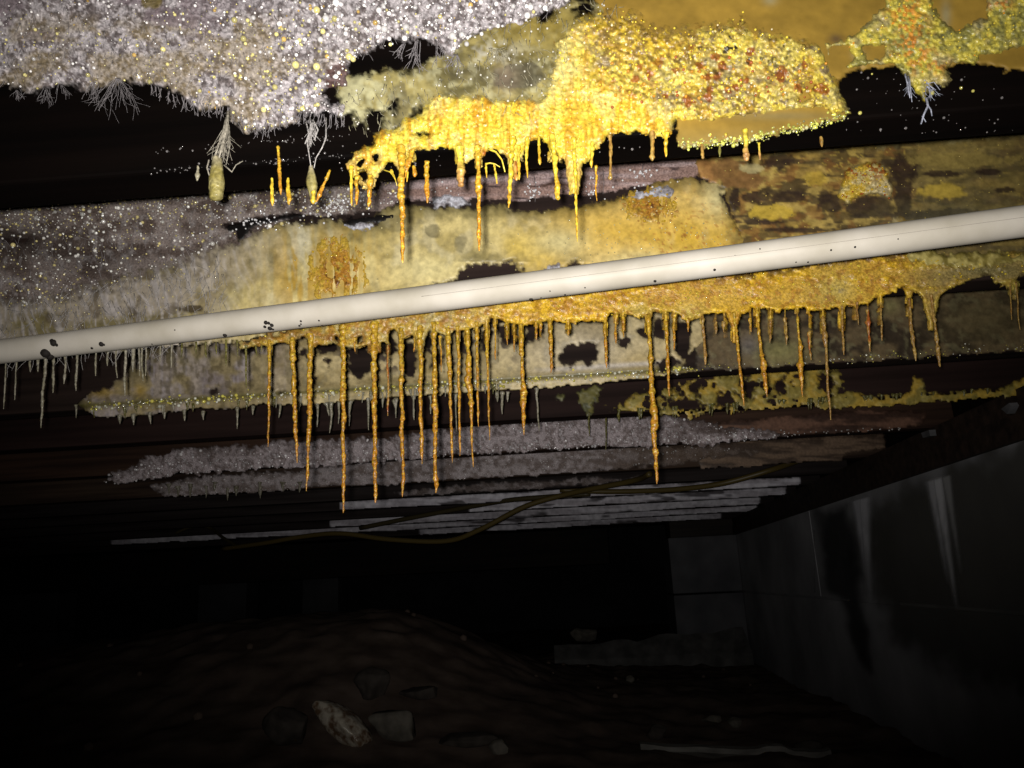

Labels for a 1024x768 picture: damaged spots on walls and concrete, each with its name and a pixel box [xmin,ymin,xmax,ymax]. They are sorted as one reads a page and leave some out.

corrosion [307,234,369,299]
damp [0,0,1024,339]
damp [3,287,1024,544]